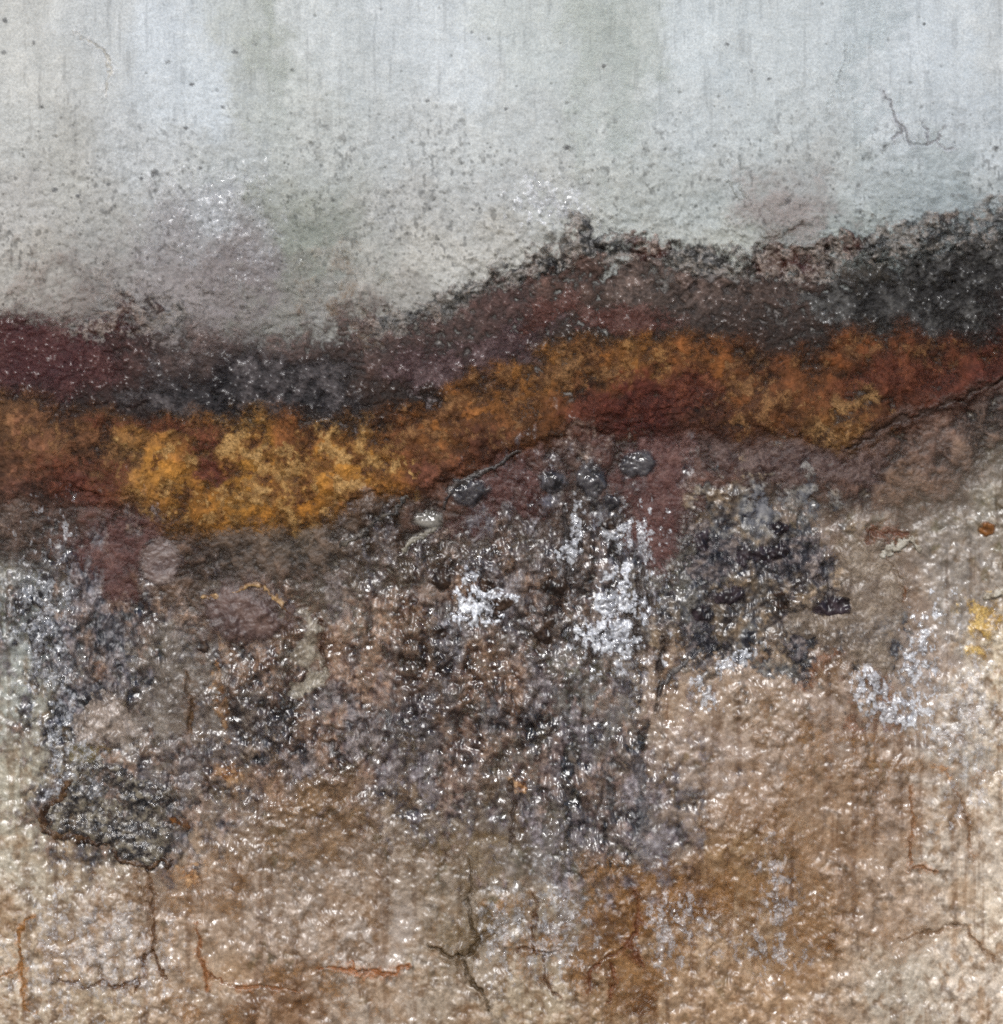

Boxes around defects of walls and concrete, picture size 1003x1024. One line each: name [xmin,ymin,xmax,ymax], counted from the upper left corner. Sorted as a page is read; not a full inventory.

crack [882,90,956,151]
corrosion [0,327,1003,532]
leakage [0,230,1003,907]
peeling [38,757,182,872]
crack [0,916,35,1014]
crack [56,871,167,993]
crack [195,922,303,993]
crack [320,964,410,978]
crack [428,877,495,1012]
crack [516,893,562,998]